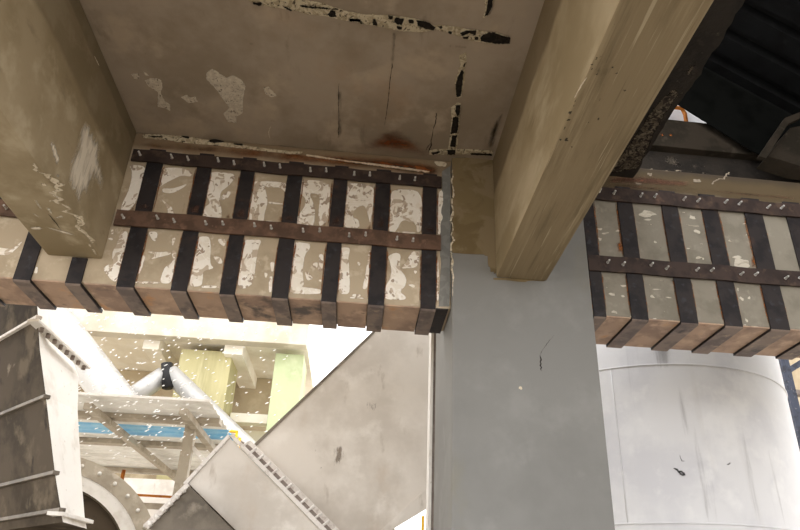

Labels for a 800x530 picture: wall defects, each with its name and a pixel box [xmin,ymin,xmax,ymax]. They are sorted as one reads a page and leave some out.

spalling [249,0,510,44]
peeling [131,72,170,111]
corrosion [378,135,412,148]
peeling [612,90,678,173]
peeling [142,53,543,300]
peeling [135,238,176,284]